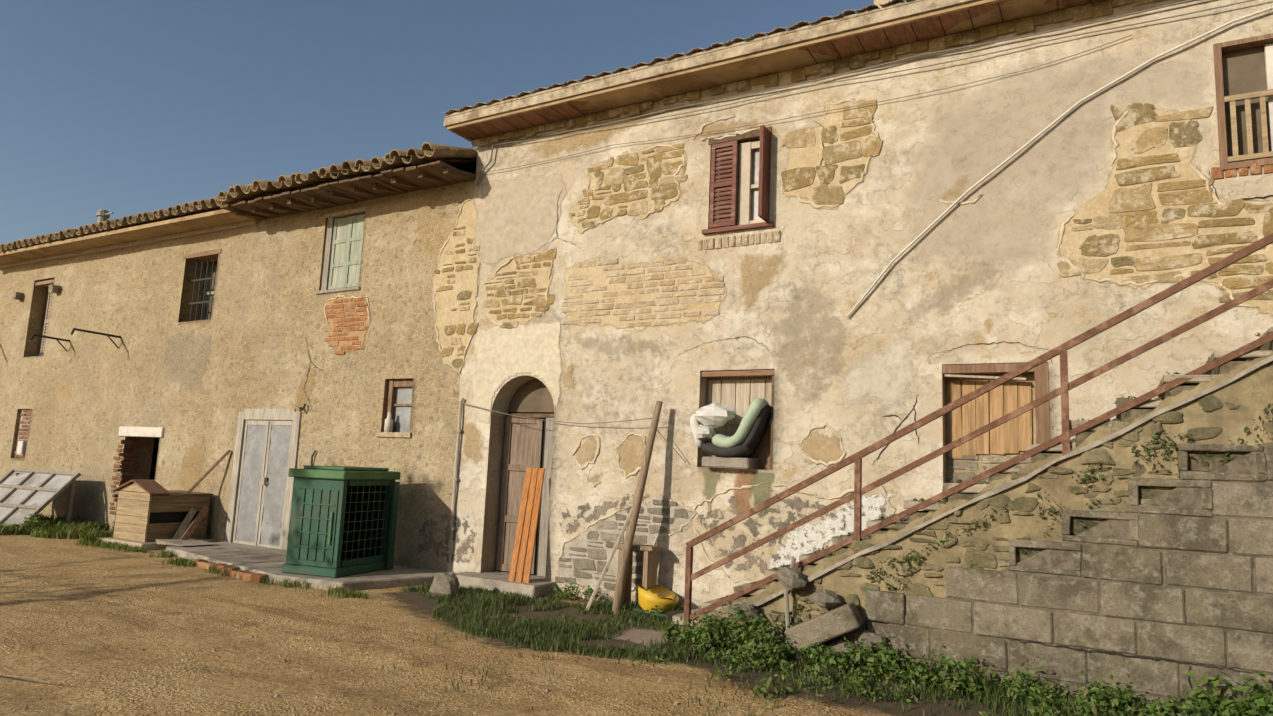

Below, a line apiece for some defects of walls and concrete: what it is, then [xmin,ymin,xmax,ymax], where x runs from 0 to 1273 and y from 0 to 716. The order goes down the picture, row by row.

flaking render [450,101,649,155]
flaking render [781,99,883,209]
flaking render [1057,103,1273,315]
flaking render [433,116,756,462]
flaking render [324,295,371,355]
flaking render [572,434,603,488]
flaking render [616,432,646,479]
flaking render [799,423,847,467]
crack [872,394,919,465]
flaking render [555,484,896,592]